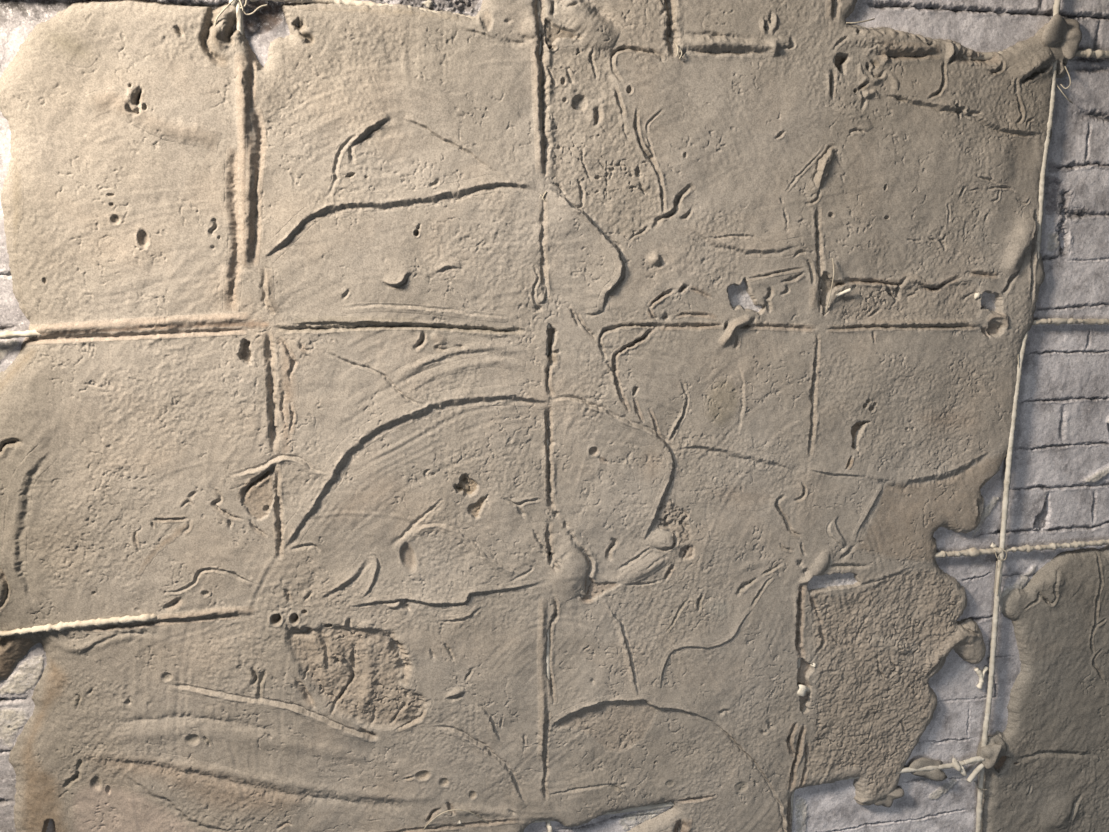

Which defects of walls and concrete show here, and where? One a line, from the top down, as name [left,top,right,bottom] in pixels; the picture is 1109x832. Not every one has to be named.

spalling [853,58,881,93]
spalling [727,280,763,312]
spalling [974,292,1010,339]
crack [567,283,718,442]
crack [501,496,541,518]
spalling [1032,496,1050,528]
spalling [807,573,858,591]
peeling [797,685,811,696]
crack [654,761,675,788]
spalling [994,755,1019,770]
spalling [673,818,693,832]